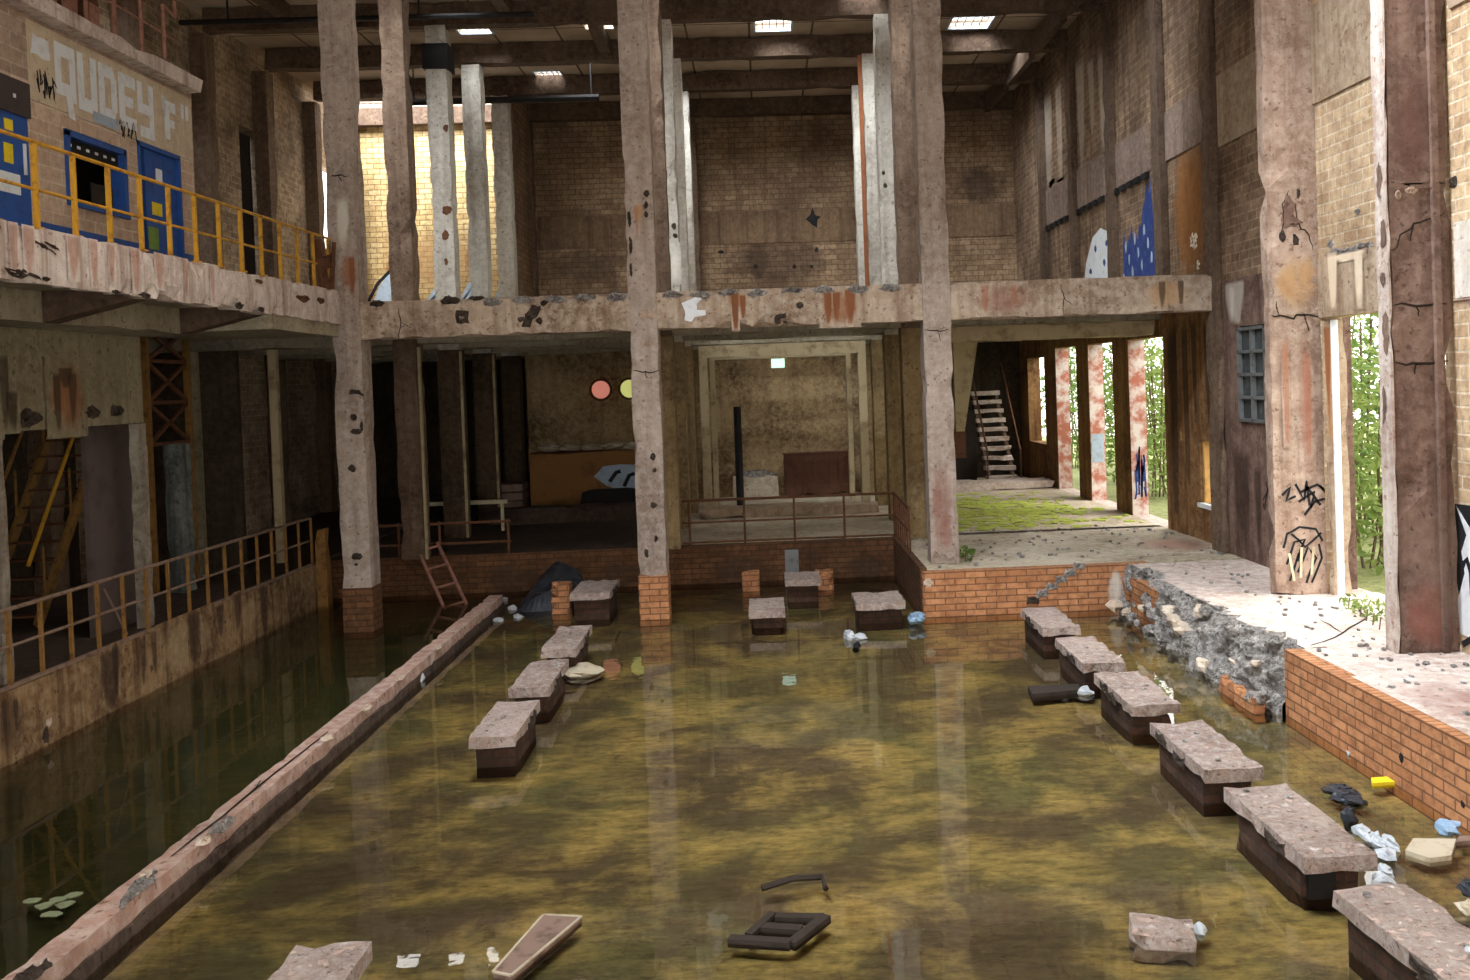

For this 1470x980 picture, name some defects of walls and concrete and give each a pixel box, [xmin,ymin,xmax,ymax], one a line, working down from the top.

peeling [1376,161,1418,200]
peeling [1271,189,1386,315]
rust [725,290,748,331]
rust [818,286,861,328]
spalling [1105,563,1330,725]